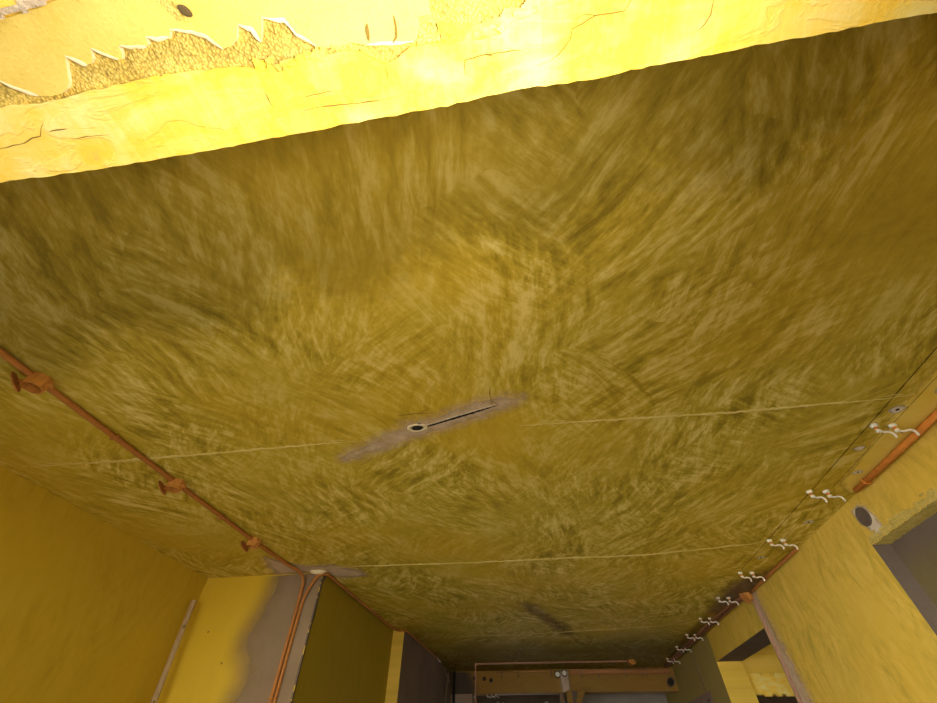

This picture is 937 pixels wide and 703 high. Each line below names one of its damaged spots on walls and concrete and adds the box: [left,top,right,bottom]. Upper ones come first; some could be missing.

peeling [0,0,526,108]
crack [464,50,521,69]
crack [538,1,631,66]
crack [299,68,395,111]
crack [0,124,110,149]